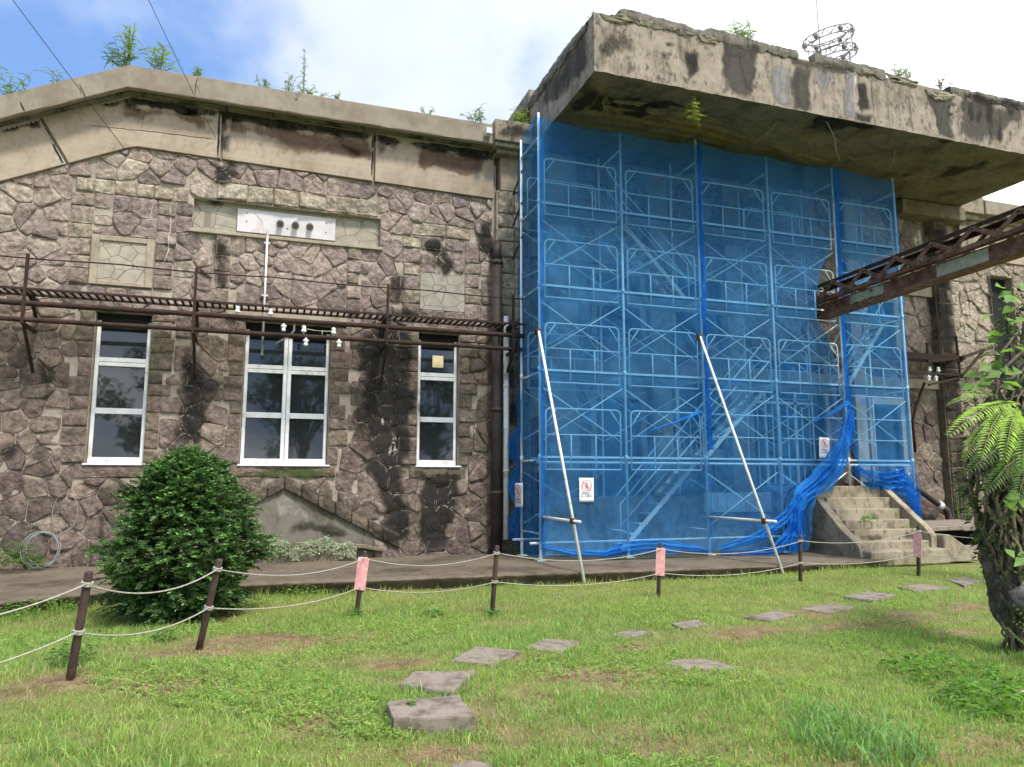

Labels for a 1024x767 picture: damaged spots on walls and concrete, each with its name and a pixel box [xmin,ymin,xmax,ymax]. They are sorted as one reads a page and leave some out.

leakage [686,52,698,76]
leakage [723,44,759,96]
leakage [773,58,874,132]
leakage [929,94,1023,144]
leakage [426,240,452,274]
leakage [354,274,460,549]